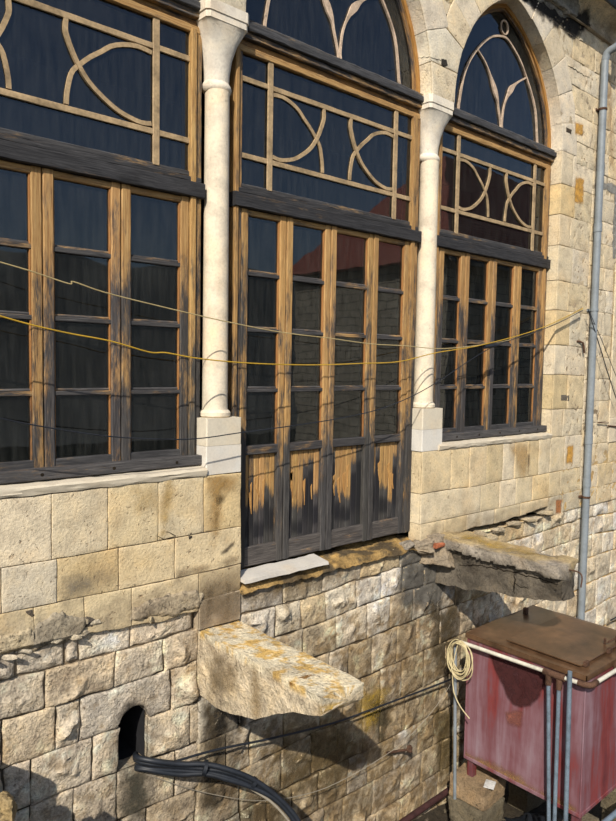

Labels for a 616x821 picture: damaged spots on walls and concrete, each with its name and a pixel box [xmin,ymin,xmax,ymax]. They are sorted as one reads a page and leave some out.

damp [523,0,591,40]
corrosion [575,178,584,203]
crack [335,564,558,668]
damp [204,706,243,763]
damp [204,777,221,808]